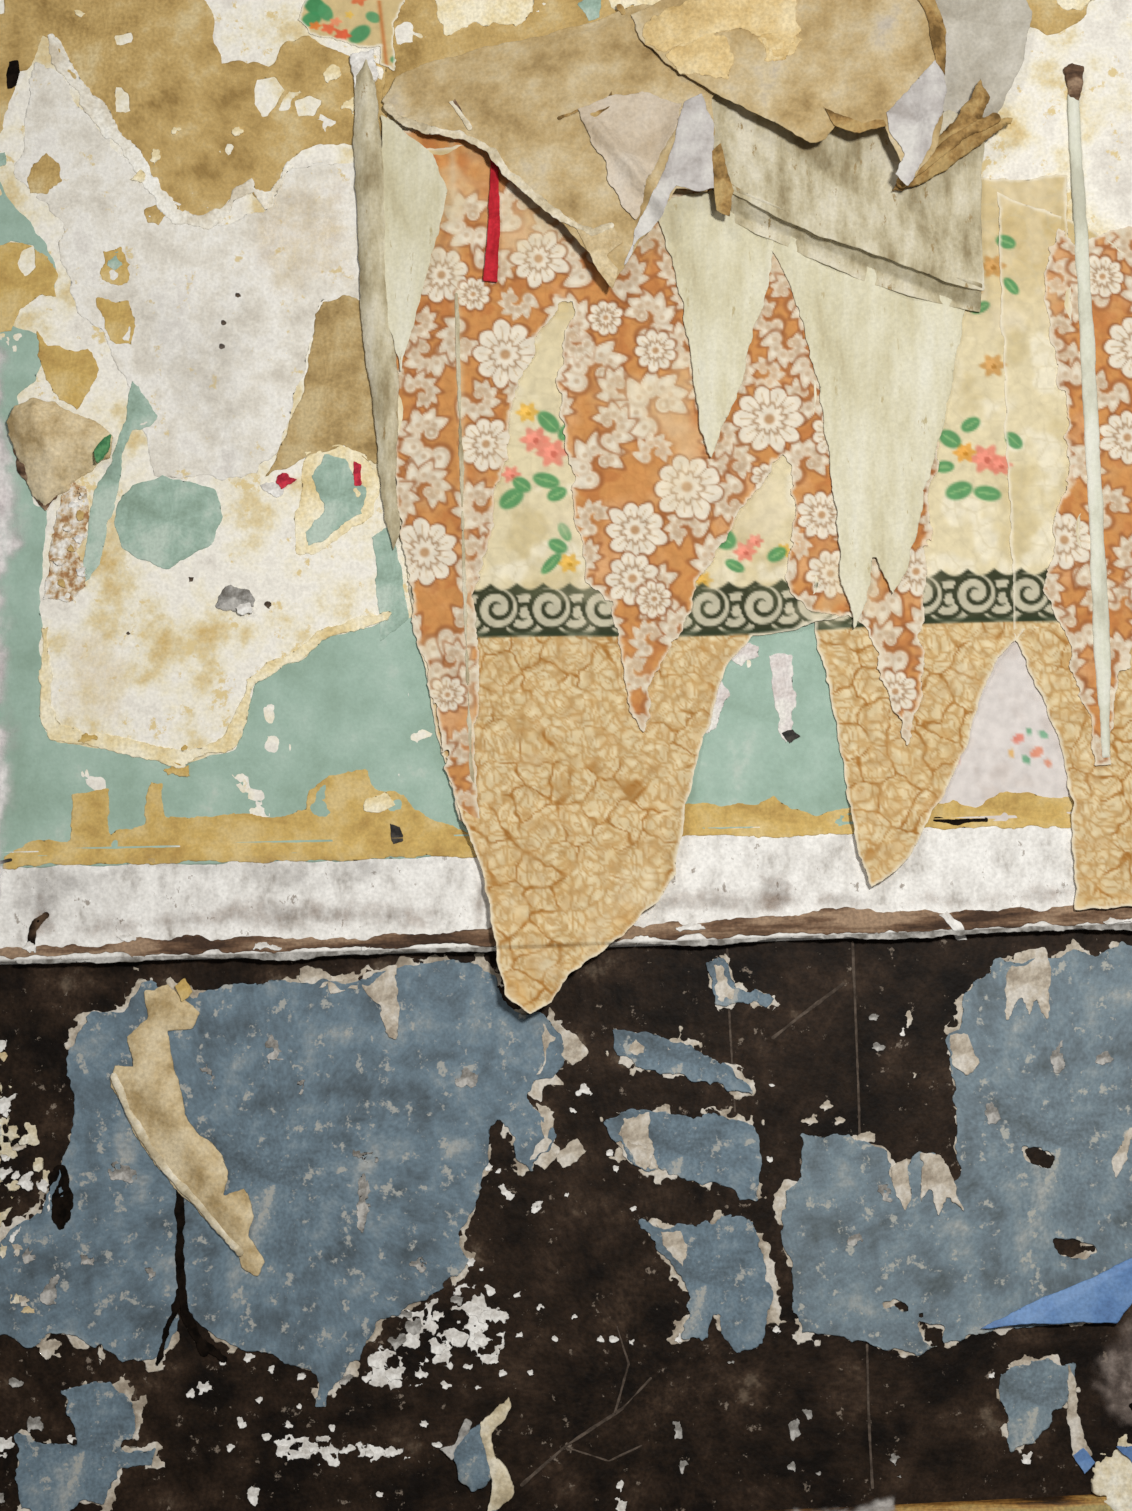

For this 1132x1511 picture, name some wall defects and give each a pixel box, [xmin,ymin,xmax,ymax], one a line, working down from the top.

flaking render [1026,0,1094,35]
peeling [0,0,660,498]
flaking render [43,482,89,602]
peeling [732,642,800,743]
flaking render [924,641,1074,830]
flaking render [682,796,855,838]
peeling [597,905,1132,1364]
peeling [0,927,592,1511]
peeling [788,1409,812,1441]
peeling [989,1354,1095,1474]
damp [1108,1333,1132,1410]
peeling [615,1480,627,1511]